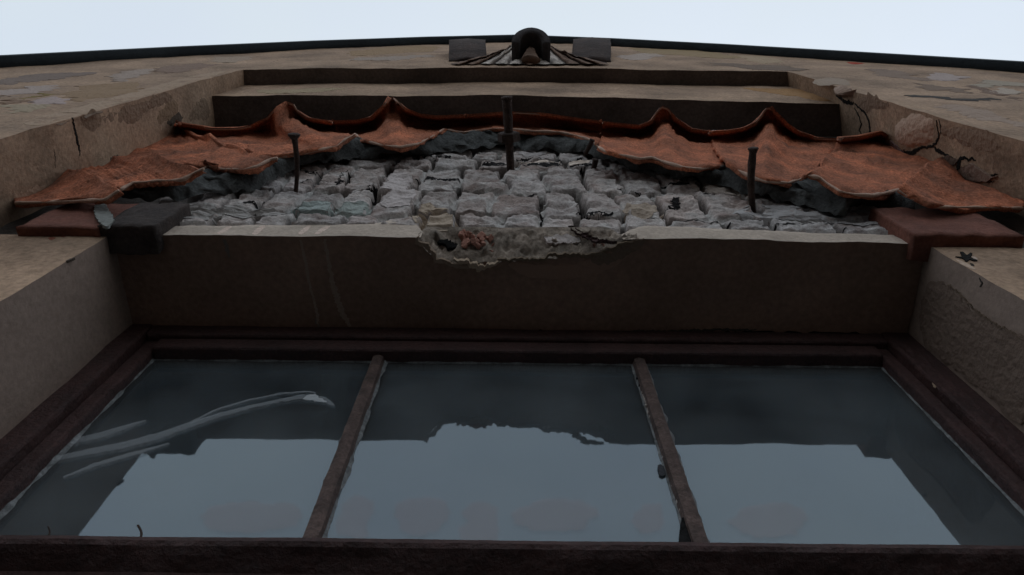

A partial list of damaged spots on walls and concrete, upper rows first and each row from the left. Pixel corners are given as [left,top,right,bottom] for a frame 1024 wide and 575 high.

crack [54,117,81,168]
crack [836,95,871,134]
crack [901,95,1001,183]
flaking render [120,128,899,272]